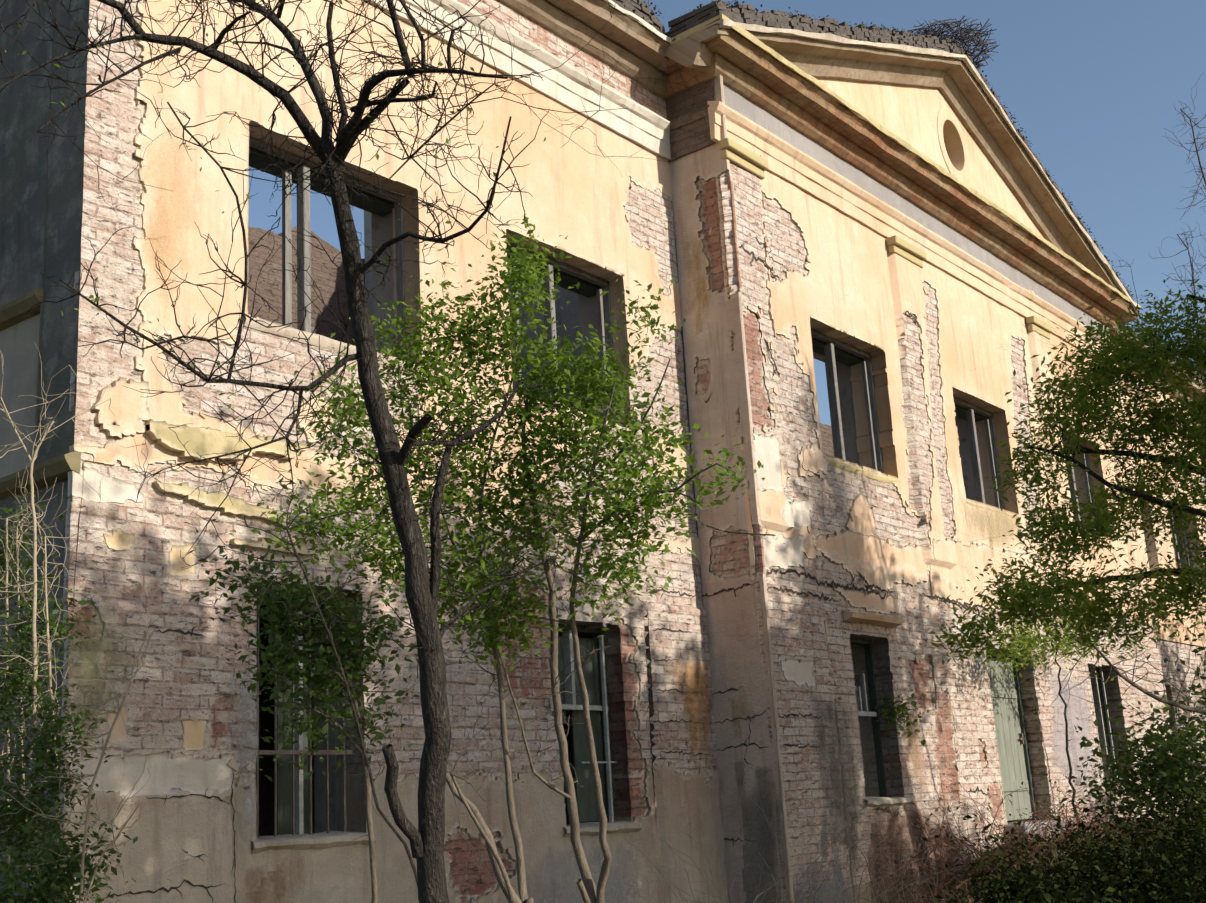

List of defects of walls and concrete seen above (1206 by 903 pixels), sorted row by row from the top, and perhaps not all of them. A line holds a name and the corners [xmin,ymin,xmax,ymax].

spalling [695,162,957,547]